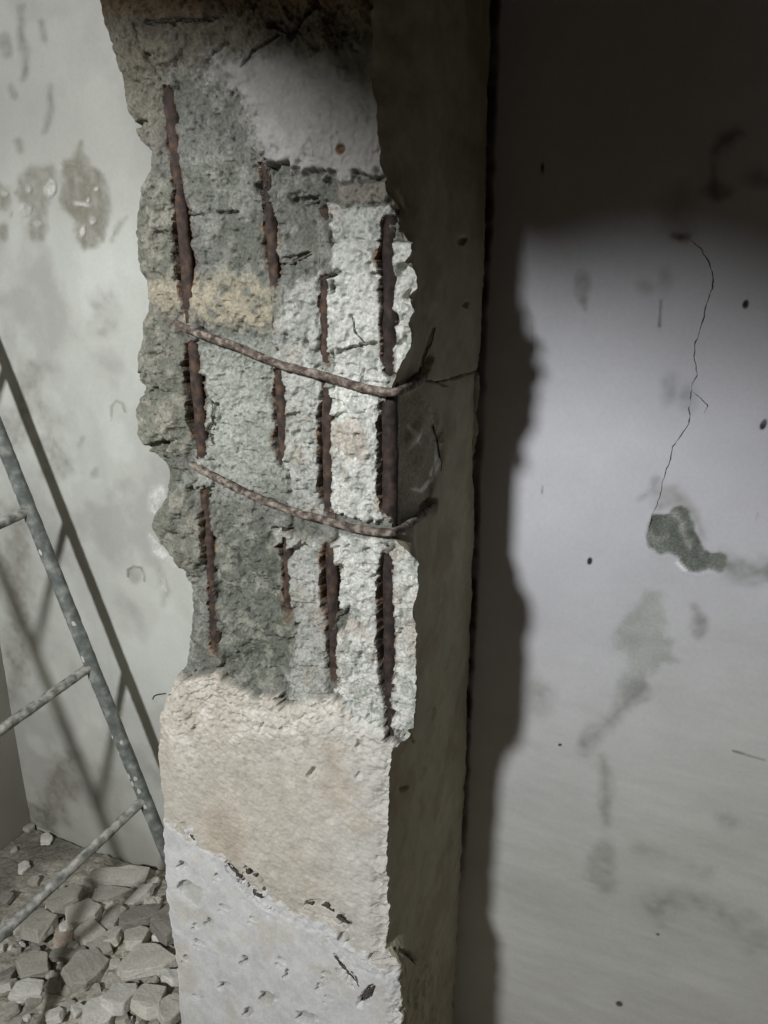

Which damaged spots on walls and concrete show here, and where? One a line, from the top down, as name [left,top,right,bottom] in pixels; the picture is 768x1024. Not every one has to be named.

corrosion [161,84,199,310]
corrosion [374,212,404,377]
corrosion [179,341,210,459]
spalling [100,0,440,971]
corrosion [270,367,288,470]
corrosion [315,387,341,516]
corrosion [375,400,385,514]
crack [649,241,714,526]
corrosion [197,484,221,657]
corrosion [317,542,345,684]
corrosion [374,555,399,743]
spalling [242,991,276,1018]